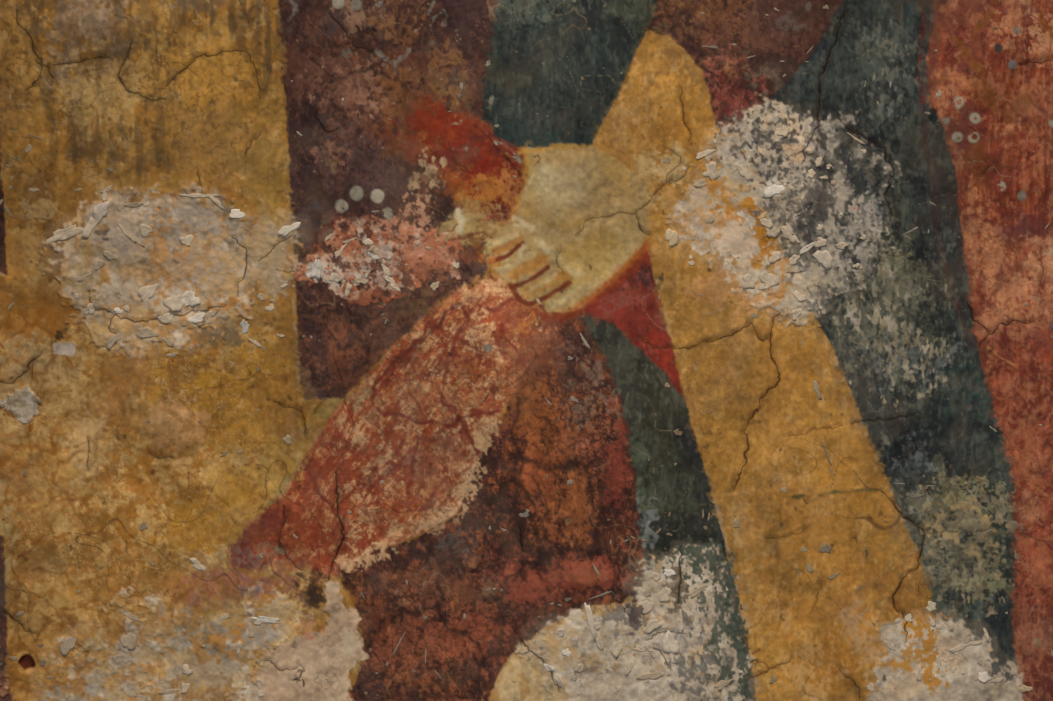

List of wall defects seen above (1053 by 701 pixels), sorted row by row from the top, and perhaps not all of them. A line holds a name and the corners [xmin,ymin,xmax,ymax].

crack [16,9,261,101]
peeling [23,168,466,378]
peeling [661,92,956,420]
crack [0,351,43,409]
crack [639,312,781,491]
crack [788,411,922,437]
peeling [0,579,371,701]
peeling [190,558,206,571]
peeling [512,509,777,701]
peeling [863,470,1033,701]